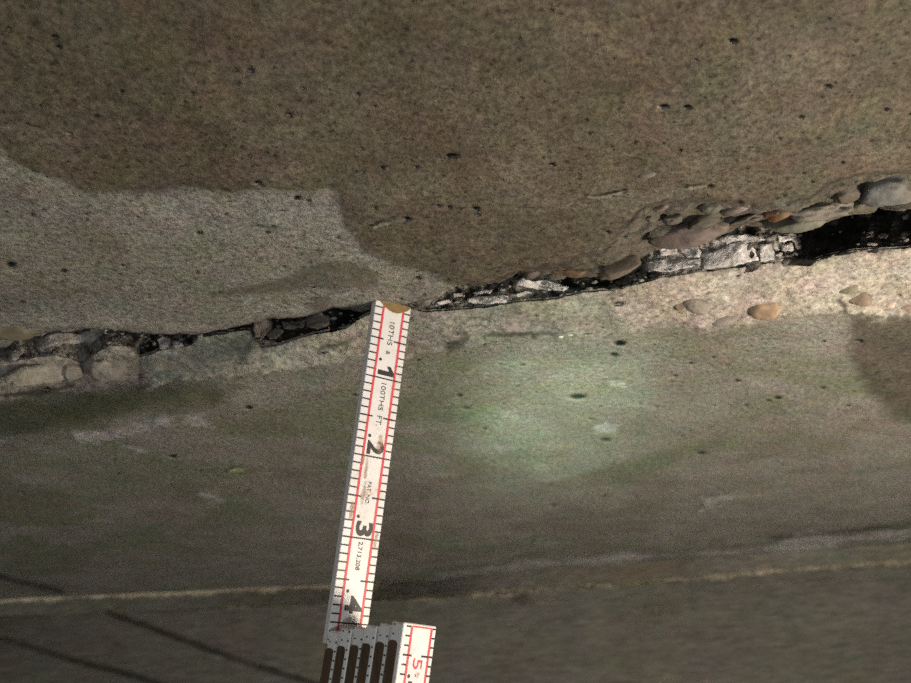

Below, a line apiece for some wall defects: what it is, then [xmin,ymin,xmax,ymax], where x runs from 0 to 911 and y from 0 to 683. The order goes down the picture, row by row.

crack [404,250,679,312]
spalling [404,171,911,361]
crack [699,207,911,273]
crack [3,385,73,396]
spalling [0,314,370,404]
crack [0,307,371,378]
crack [449,333,468,351]
crack [497,330,547,338]
water stain [853,313,911,417]